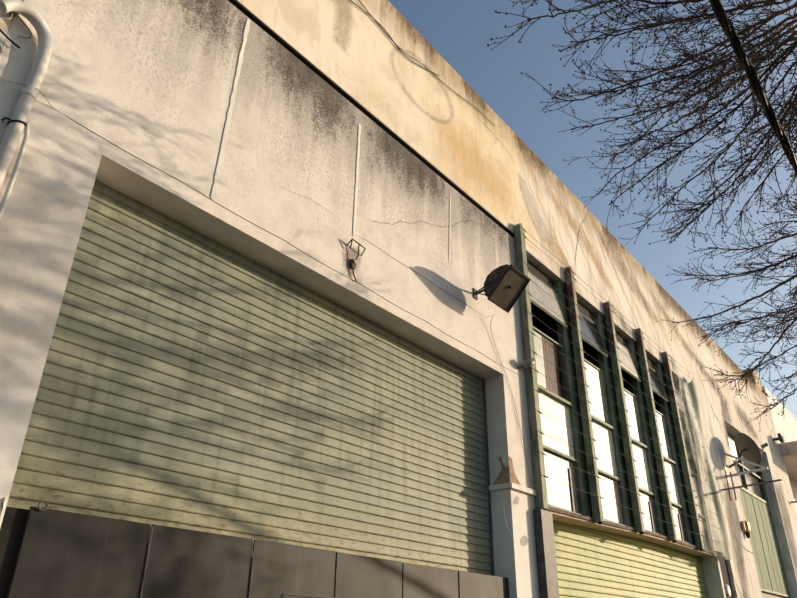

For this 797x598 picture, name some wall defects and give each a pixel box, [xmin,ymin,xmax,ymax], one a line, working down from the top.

damp [183,0,245,51]
damp [266,34,355,137]
damp [367,121,446,201]
crack [368,215,488,235]